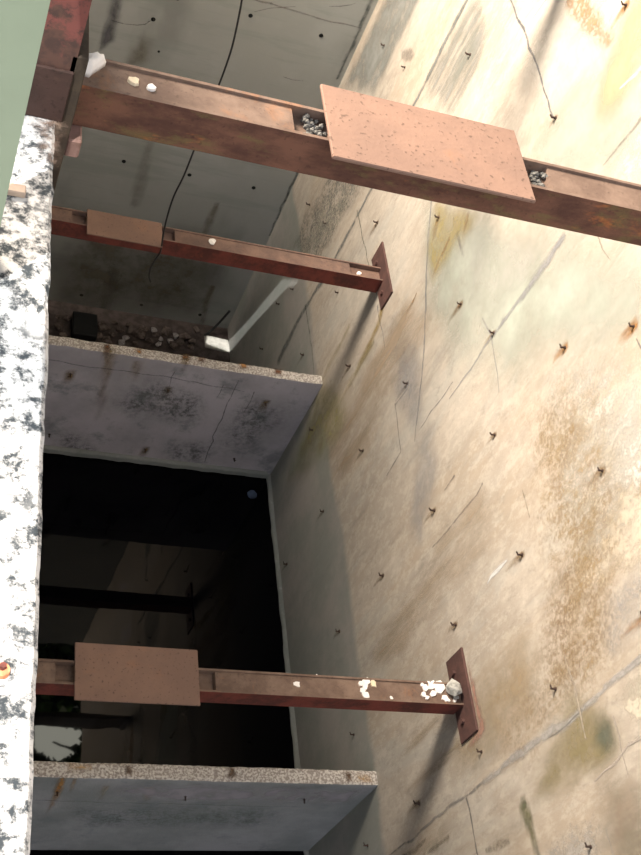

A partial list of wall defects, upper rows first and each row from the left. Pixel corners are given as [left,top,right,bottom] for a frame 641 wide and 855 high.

leakage [102,0,119,46]
crack [510,0,554,119]
leakage [532,0,628,106]